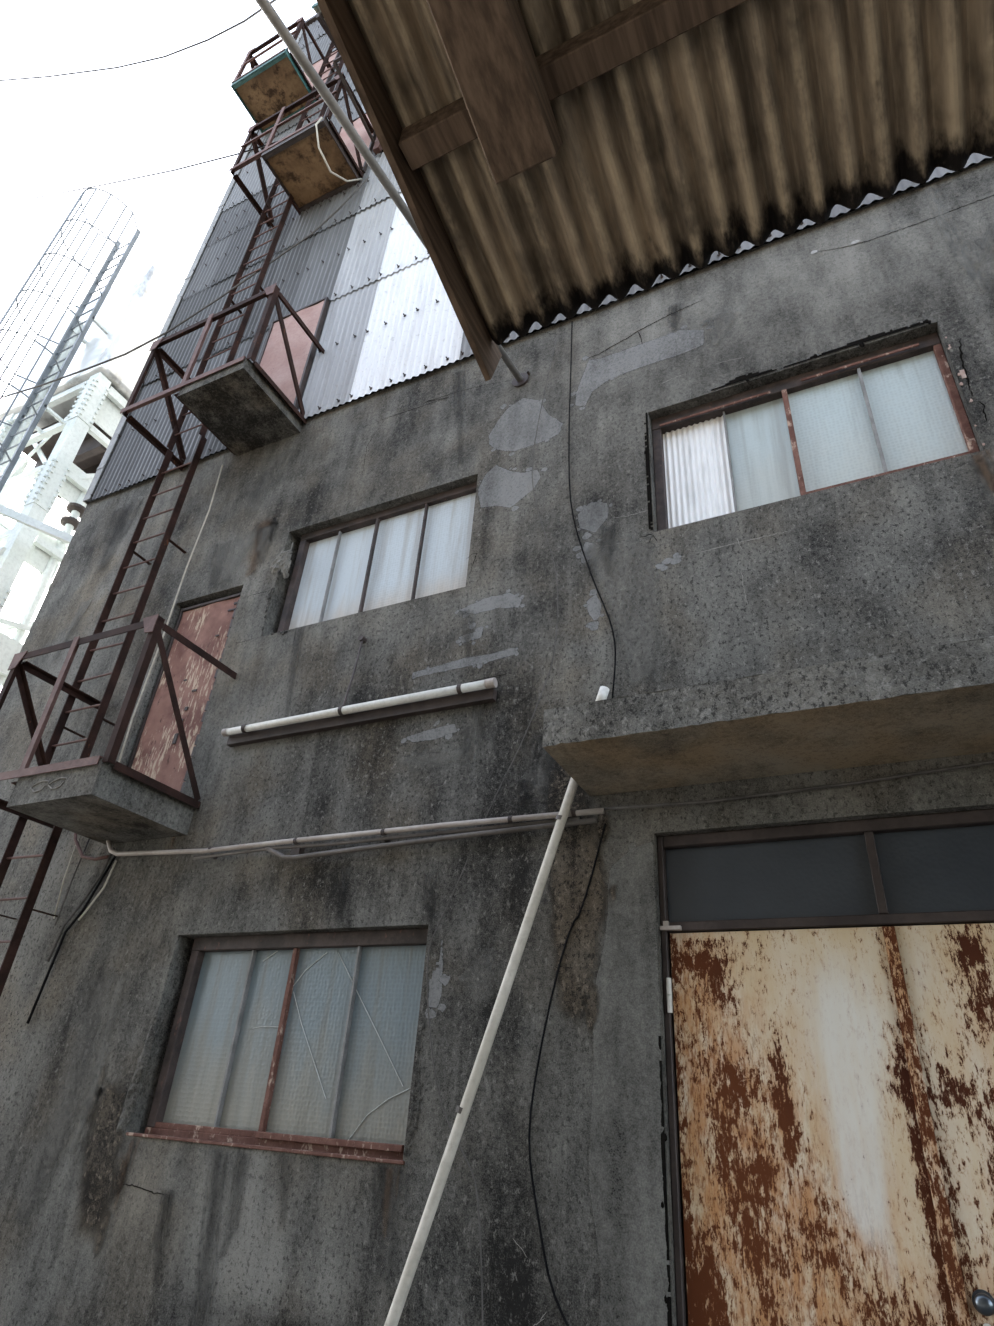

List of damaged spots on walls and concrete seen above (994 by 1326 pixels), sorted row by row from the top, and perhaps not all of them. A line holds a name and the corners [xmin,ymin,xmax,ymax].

peeling [570,325,712,410]
peeling [478,398,563,511]
leakage [22,978,128,1255]
spalling [404,929,450,1158]
leakage [155,1193,173,1277]
leakage [193,1153,245,1326]